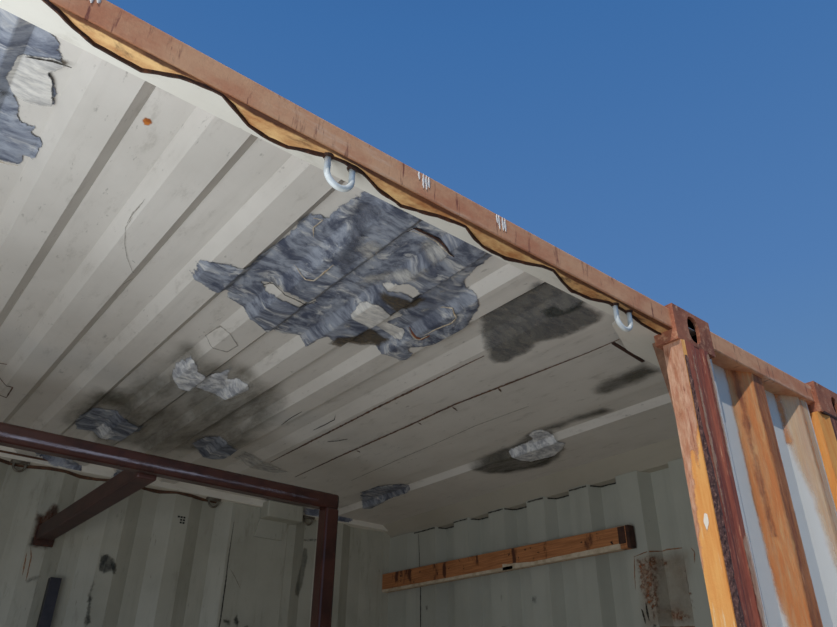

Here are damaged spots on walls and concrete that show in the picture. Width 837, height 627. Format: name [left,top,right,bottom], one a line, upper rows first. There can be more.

peeling [6,54,64,106]
corrosion [49,1,672,333]
peeling [351,302,457,340]
peeling [96,424,117,439]
water stain [476,439,558,473]
corrosion [724,369,837,627]
corrosion [634,548,679,627]